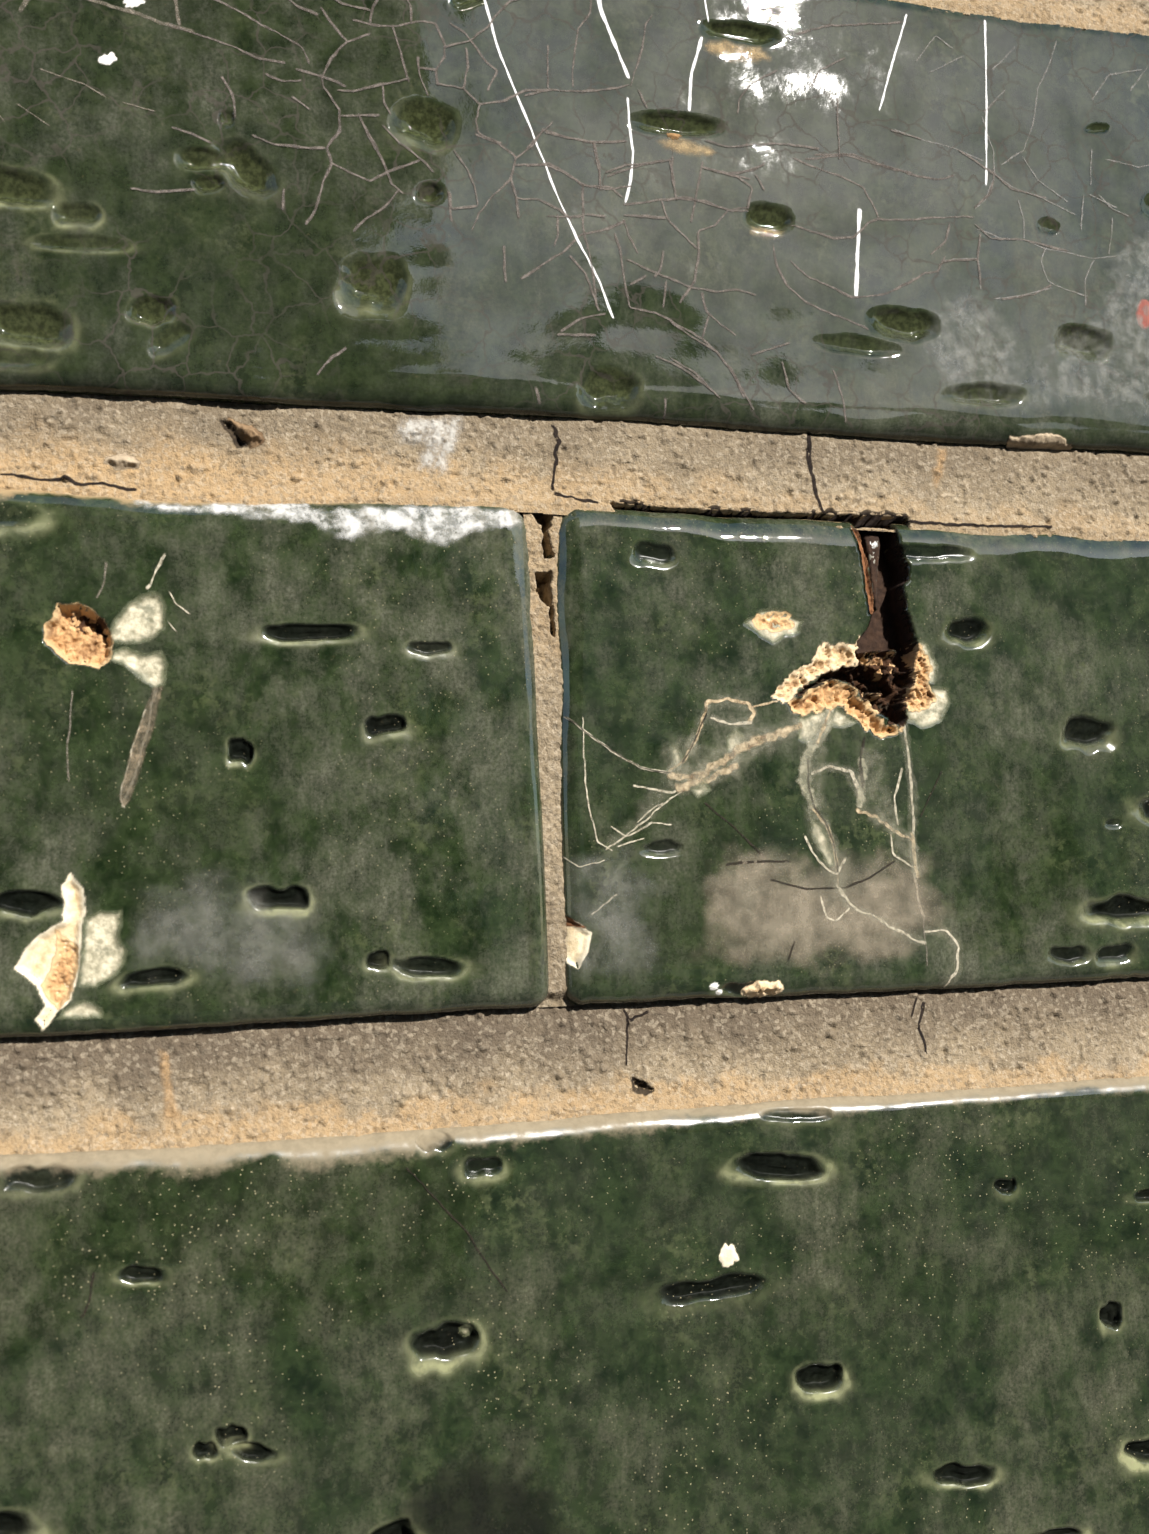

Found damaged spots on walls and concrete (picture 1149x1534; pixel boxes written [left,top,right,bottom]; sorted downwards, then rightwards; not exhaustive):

crack [89,0,1148,532]
crack [0,473,137,491]
peeling [44,595,165,805]
peeling [747,611,801,642]
spalling [771,522,971,742]
spalling [945,615,989,645]
peeling [0,873,189,1031]
crack [565,697,960,1054]
crack [623,1010,648,1065]